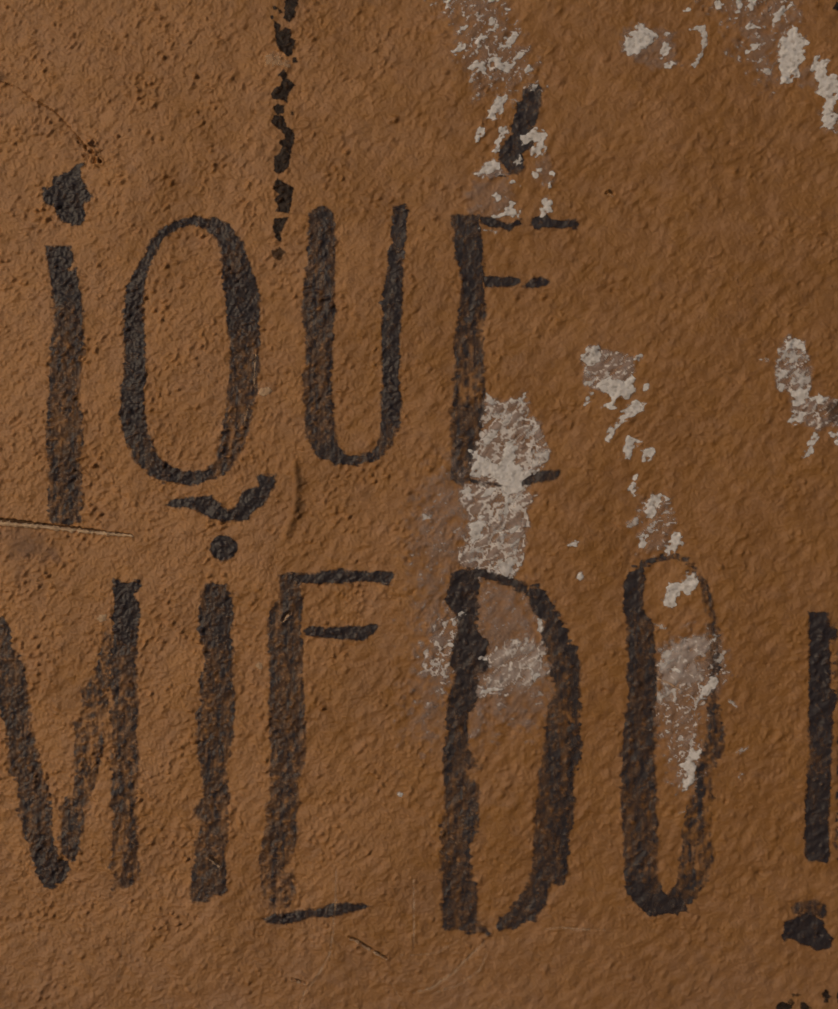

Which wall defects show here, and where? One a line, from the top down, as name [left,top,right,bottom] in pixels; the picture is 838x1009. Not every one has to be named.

peeling [468,31,532,82]
peeling [623,23,676,69]
peeling [763,25,838,129]
peeling [474,94,555,218]
peeling [580,345,649,442]
peeling [775,336,829,425]
peeling [623,435,655,462]
crack [0,518,133,537]
peeling [461,393,549,579]
peeling [627,474,670,548]
peeling [663,573,699,608]
peeling [665,730,702,791]